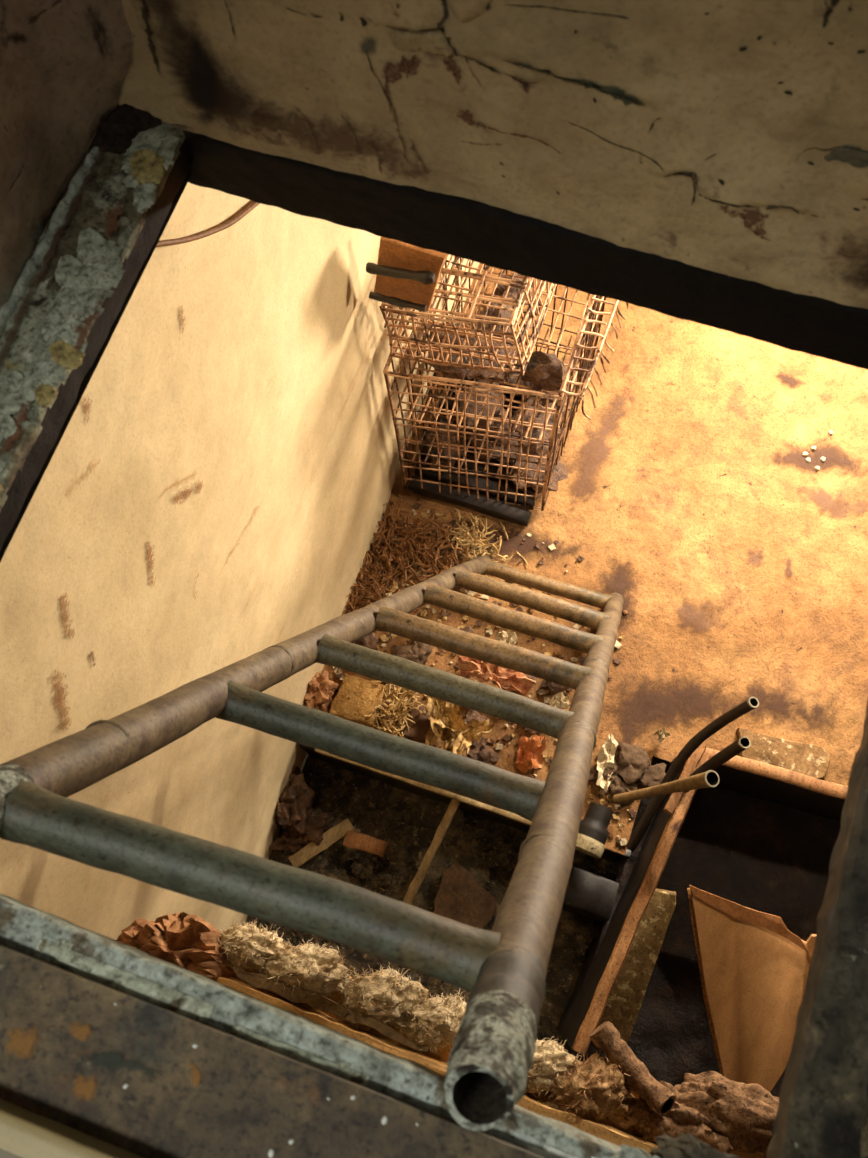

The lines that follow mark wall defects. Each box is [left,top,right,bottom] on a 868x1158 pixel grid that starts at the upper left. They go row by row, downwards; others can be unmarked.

crack [141,0,160,73]
leakage [146,0,428,178]
crack [366,0,799,214]
peeling [121,122,180,213]
crack [795,146,868,162]
peeling [0,227,125,503]
rust [175,483,202,504]
rust [147,542,156,585]
rust [60,593,74,638]
rust [50,670,71,730]